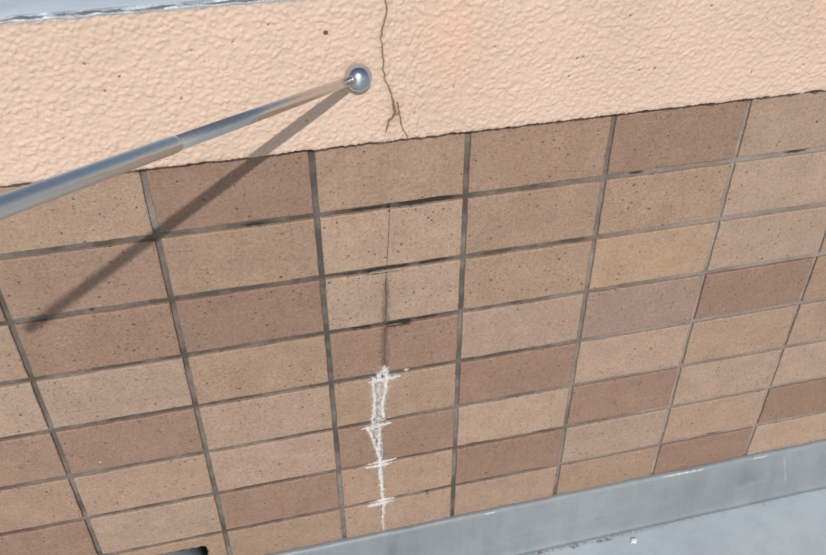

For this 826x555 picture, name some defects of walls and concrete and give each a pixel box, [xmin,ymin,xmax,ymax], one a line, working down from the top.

crack [373,0,409,142]